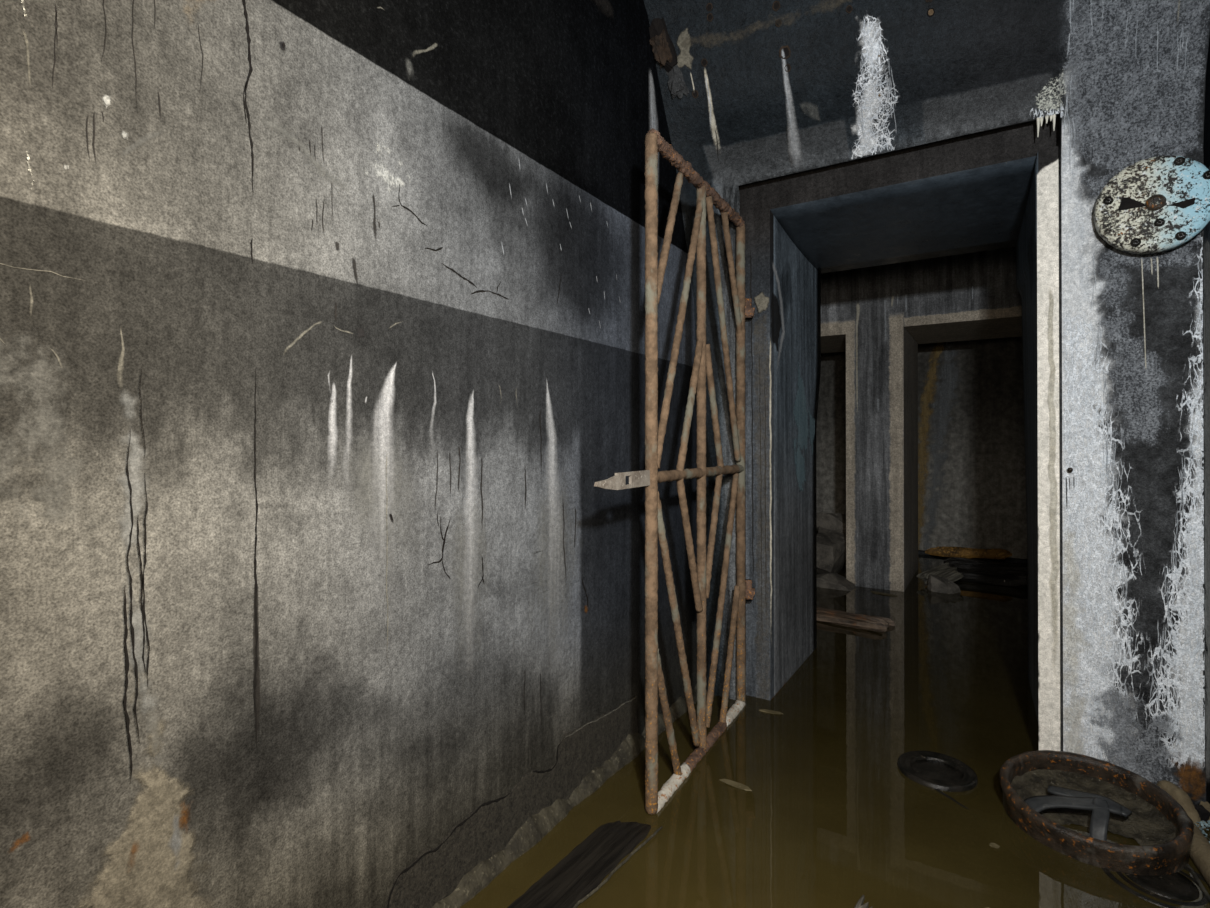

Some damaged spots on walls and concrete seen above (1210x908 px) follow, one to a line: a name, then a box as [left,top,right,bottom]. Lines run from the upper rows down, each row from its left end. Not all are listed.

crack [242,0,254,189]
leakage [852,16,898,159]
leakage [330,362,352,449]
leakage [381,365,396,435]
leakage [435,395,483,521]
leakage [540,384,554,474]
leakage [1030,0,1210,790]
crack [123,372,155,776]